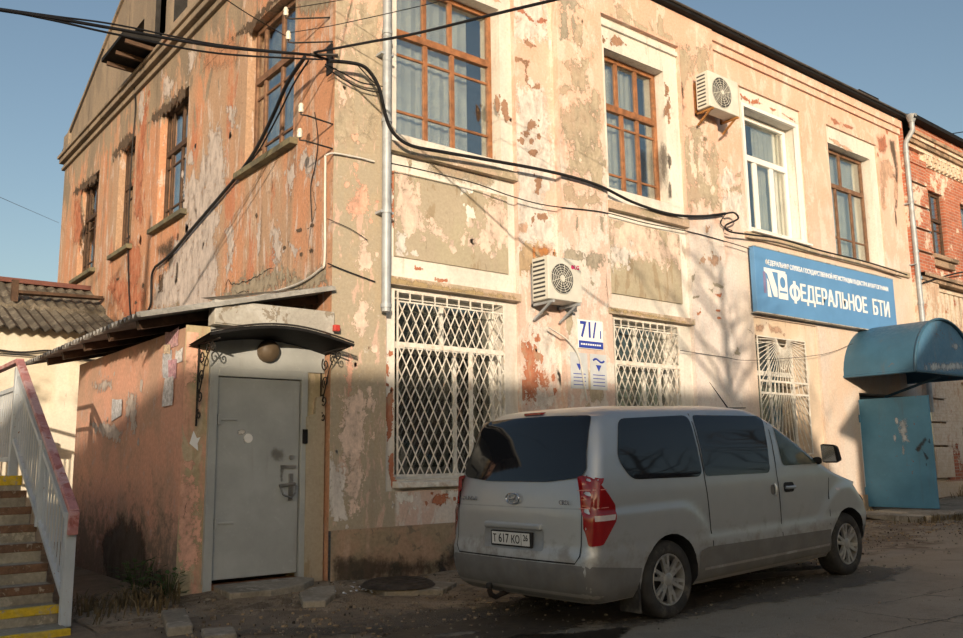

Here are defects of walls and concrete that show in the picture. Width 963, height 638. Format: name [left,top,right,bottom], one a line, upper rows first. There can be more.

peeling [492,94,512,123]
peeling [515,56,540,90]
peeling [517,119,541,158]
peeling [523,0,621,231]
peeling [602,34,627,48]
peeling [610,0,713,90]
peeling [663,82,671,124]
peeling [684,125,747,234]
peeling [518,213,644,286]
peeling [365,344,394,442]
peeling [521,329,562,410]
damp [101,513,165,590]